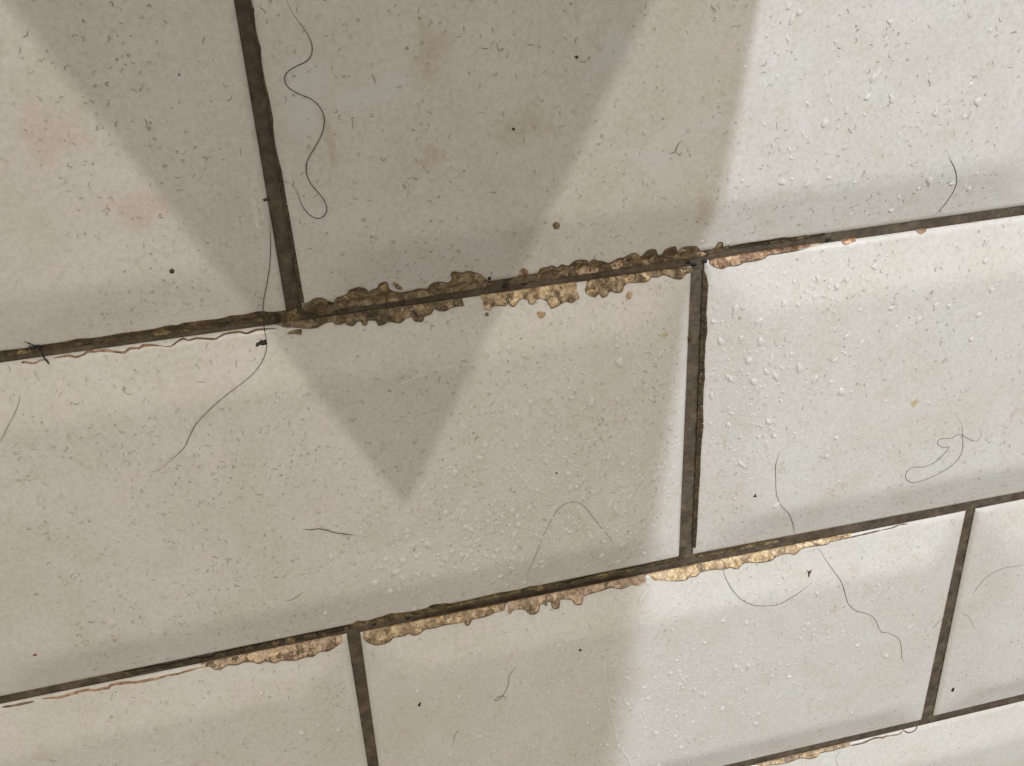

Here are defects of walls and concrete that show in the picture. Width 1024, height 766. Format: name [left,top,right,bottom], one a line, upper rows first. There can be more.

spalling [274,242,825,335]
crack [21,328,276,364]
spalling [363,533,852,646]
spalling [201,634,343,670]
crack [2,667,201,708]